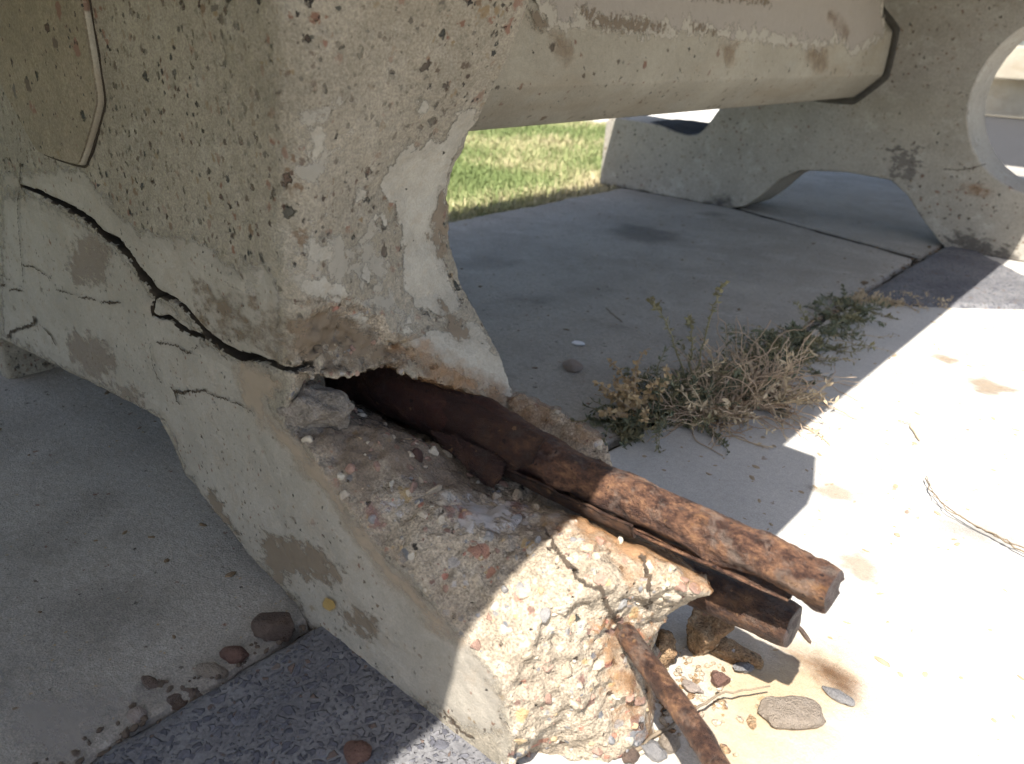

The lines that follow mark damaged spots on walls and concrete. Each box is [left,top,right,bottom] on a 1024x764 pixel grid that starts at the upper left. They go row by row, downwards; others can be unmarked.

crack [0,163,315,416]
peeling [289,96,613,467]
peeling [256,531,379,643]
spalling [286,400,712,764]
crack [541,526,623,630]
corrosion [407,421,792,602]
crack [638,553,654,610]
corrosion [820,667,851,688]